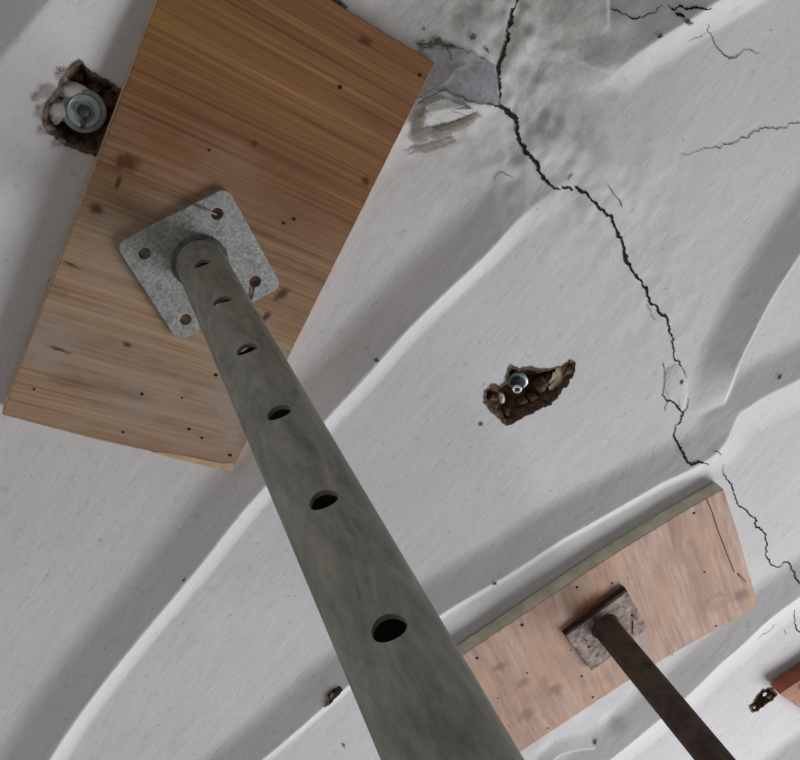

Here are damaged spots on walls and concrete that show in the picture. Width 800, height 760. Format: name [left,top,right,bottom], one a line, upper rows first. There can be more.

flaking render [33,60,121,156]
peeling [417,48,500,123]
crack [487,0,800,584]
flaking render [484,360,576,426]
flaking render [749,688,777,713]